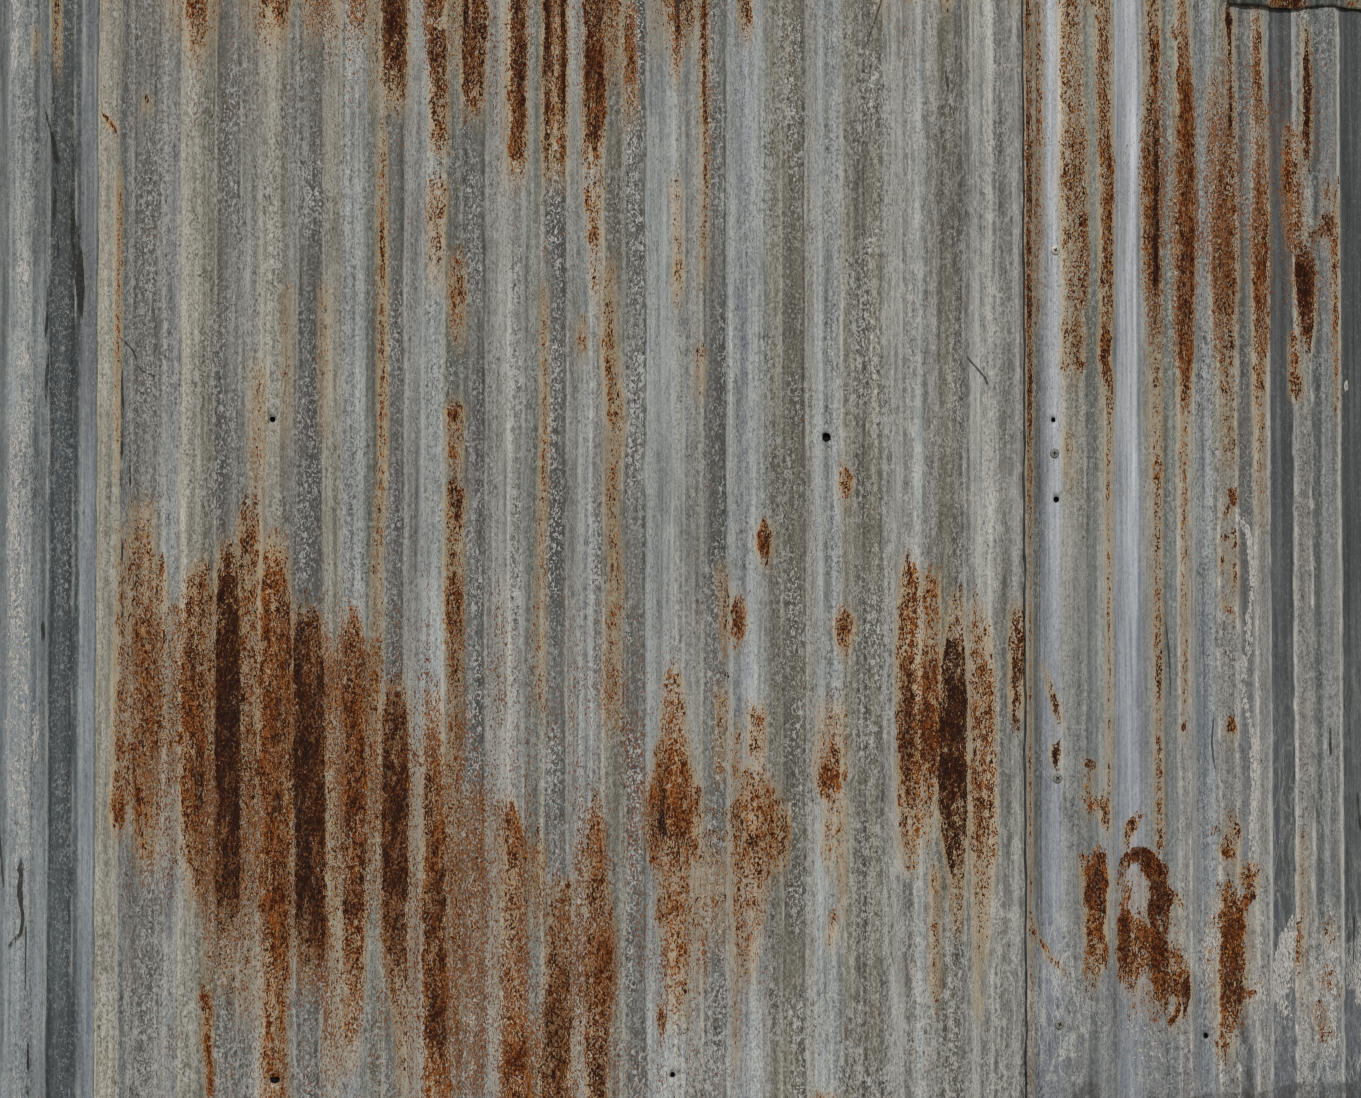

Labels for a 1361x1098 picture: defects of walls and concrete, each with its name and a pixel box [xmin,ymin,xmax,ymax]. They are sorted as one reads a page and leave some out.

rust [109,0,638,1098]
rust [651,0,709,303]
rust [639,654,791,1098]
rust [719,568,747,656]
rust [756,517,774,571]
rust [815,680,852,887]
rust [835,600,855,657]
rust [894,0,1068,1021]
rust [1058,0,1118,732]
rust [1079,0,1342,1071]